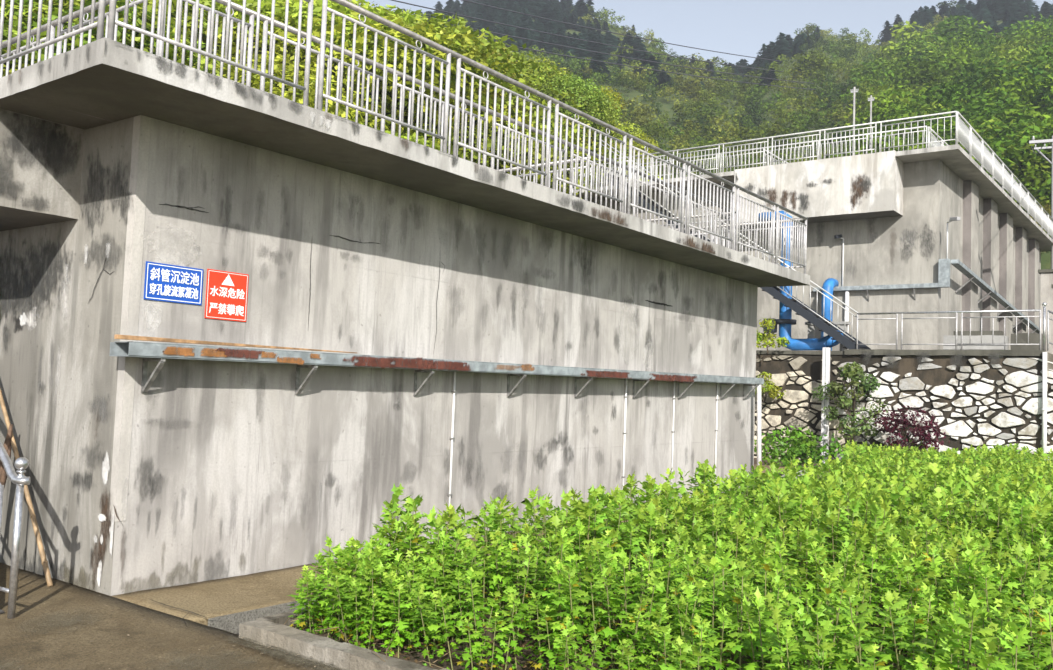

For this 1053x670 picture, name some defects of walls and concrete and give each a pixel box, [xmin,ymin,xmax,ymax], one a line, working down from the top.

damp [0,113,77,198]
damp [81,159,130,228]
crack [159,204,209,213]
crack [308,235,379,326]
damp [0,239,69,343]
corrosion [164,347,321,365]
corrosion [343,356,470,371]
corrosion [581,370,629,378]
corrosion [649,374,697,382]